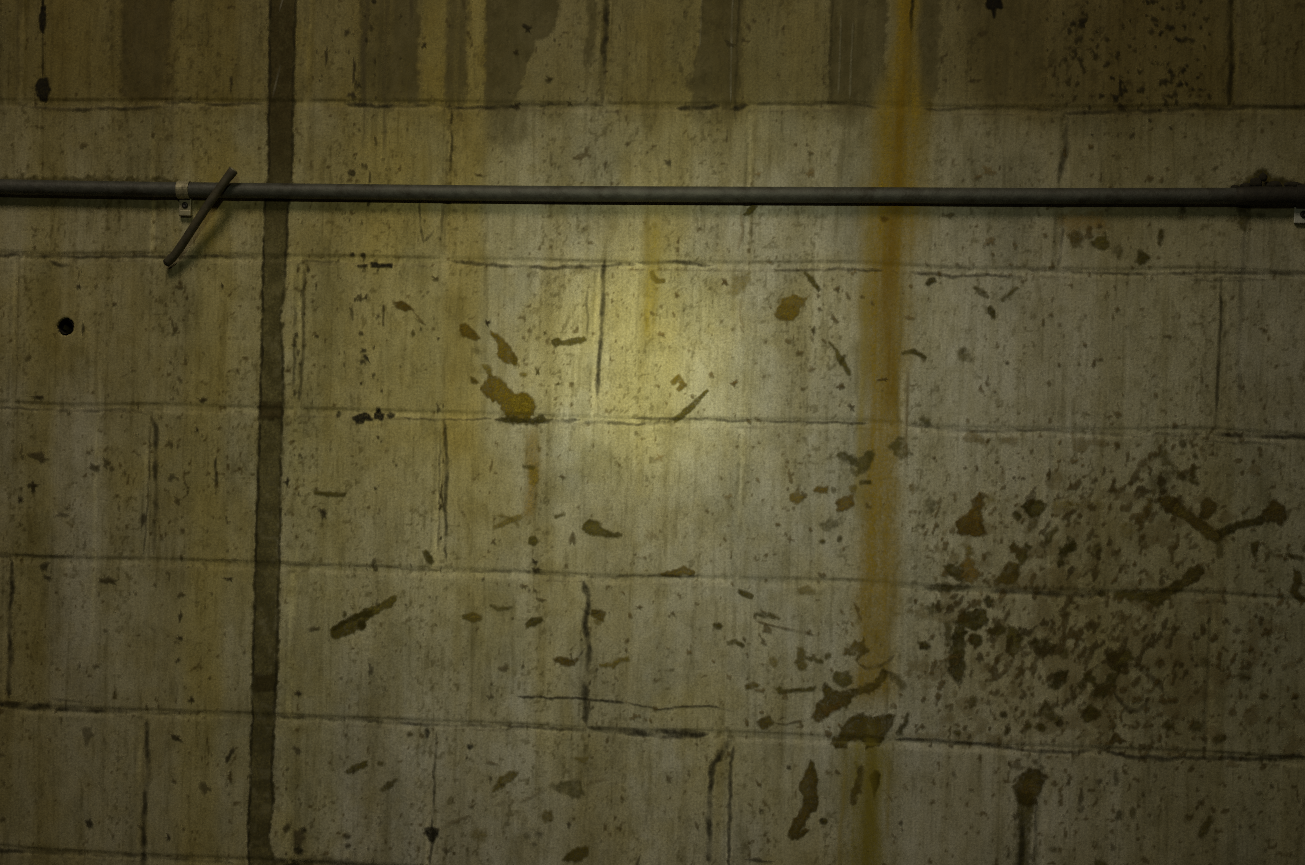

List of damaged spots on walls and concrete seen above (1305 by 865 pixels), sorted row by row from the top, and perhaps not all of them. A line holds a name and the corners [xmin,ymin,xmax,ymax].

water stain [484,0,558,110]
crack [462,261,609,384]
crack [512,585,733,859]
crack [1114,752,1302,760]
water stain [1010,761,1045,865]